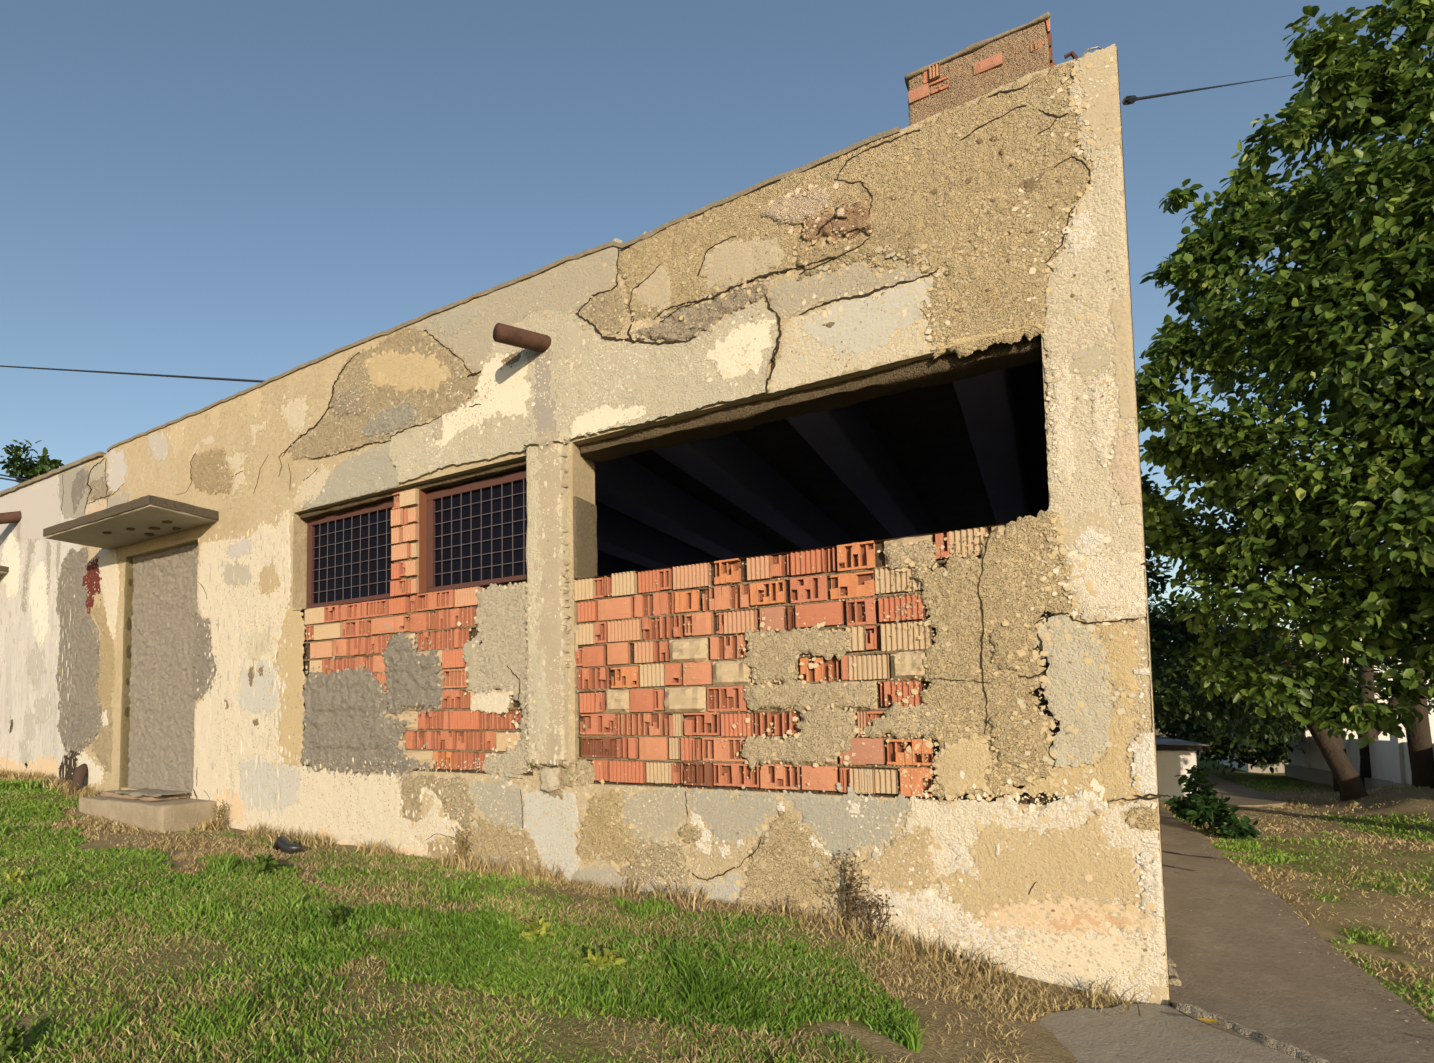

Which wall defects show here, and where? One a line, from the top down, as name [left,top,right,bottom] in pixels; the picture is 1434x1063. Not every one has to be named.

crack [576,129,939,391]
crack [960,83,1068,140]
crack [1045,156,1091,263]
spalling [1,532,120,785]
spalling [189,18,1182,1004]
crack [930,531,1139,734]